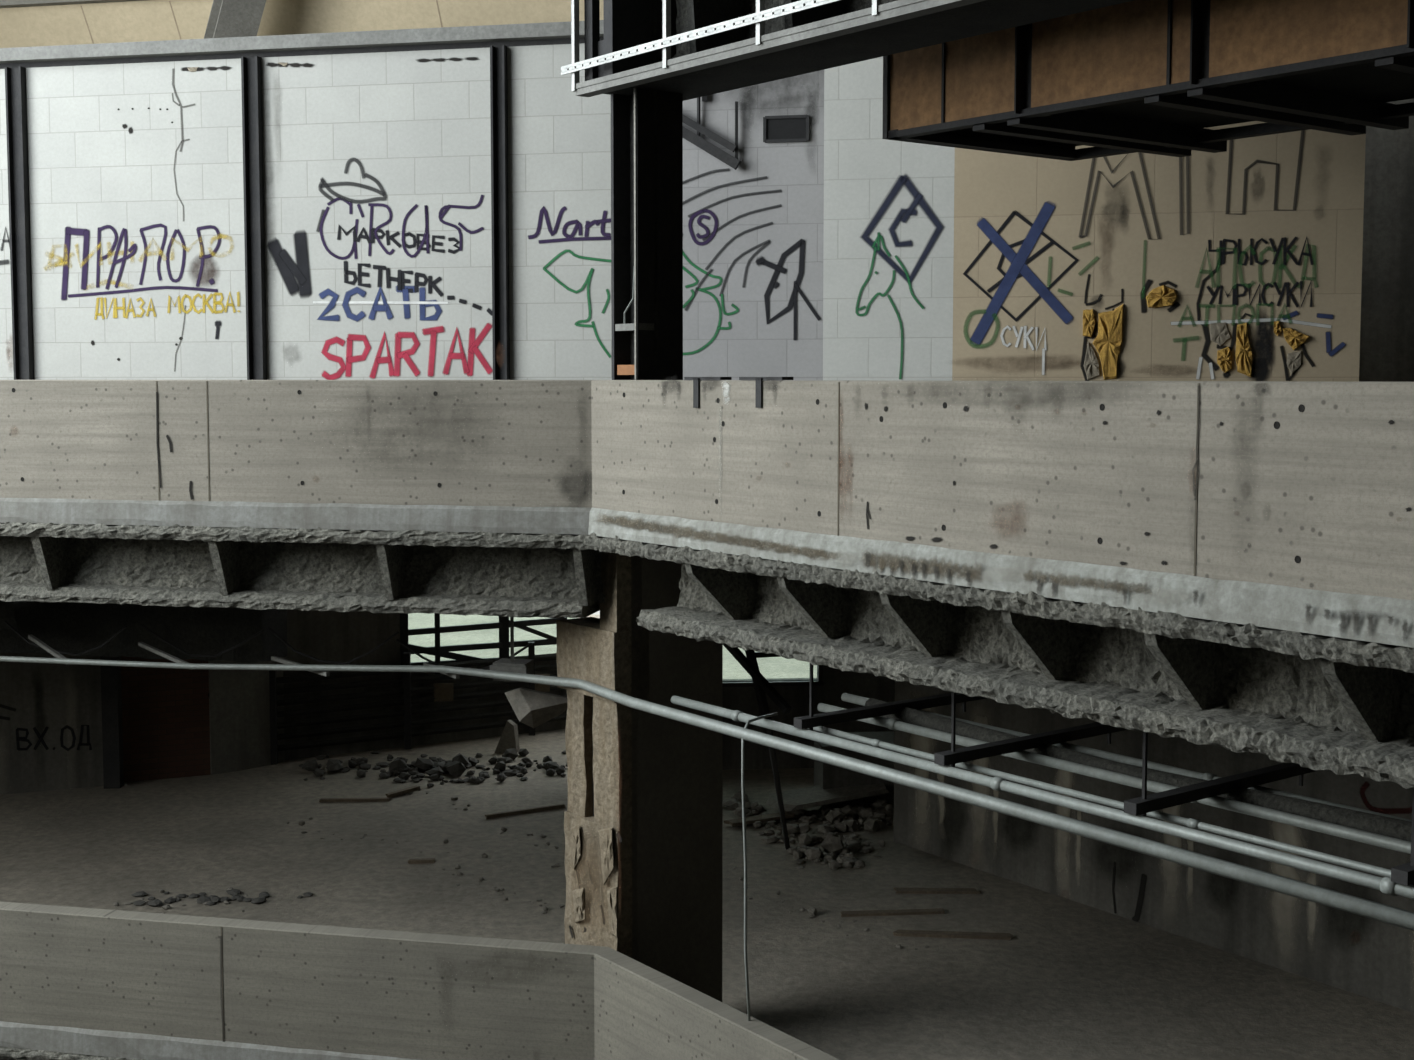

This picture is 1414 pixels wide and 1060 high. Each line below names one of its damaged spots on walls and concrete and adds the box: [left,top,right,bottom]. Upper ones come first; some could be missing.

crack [172,69,195,221]
peeling [597,515,837,559]
peeling [863,536,981,584]
peeling [1024,571,1147,602]
spalling [569,825,622,938]